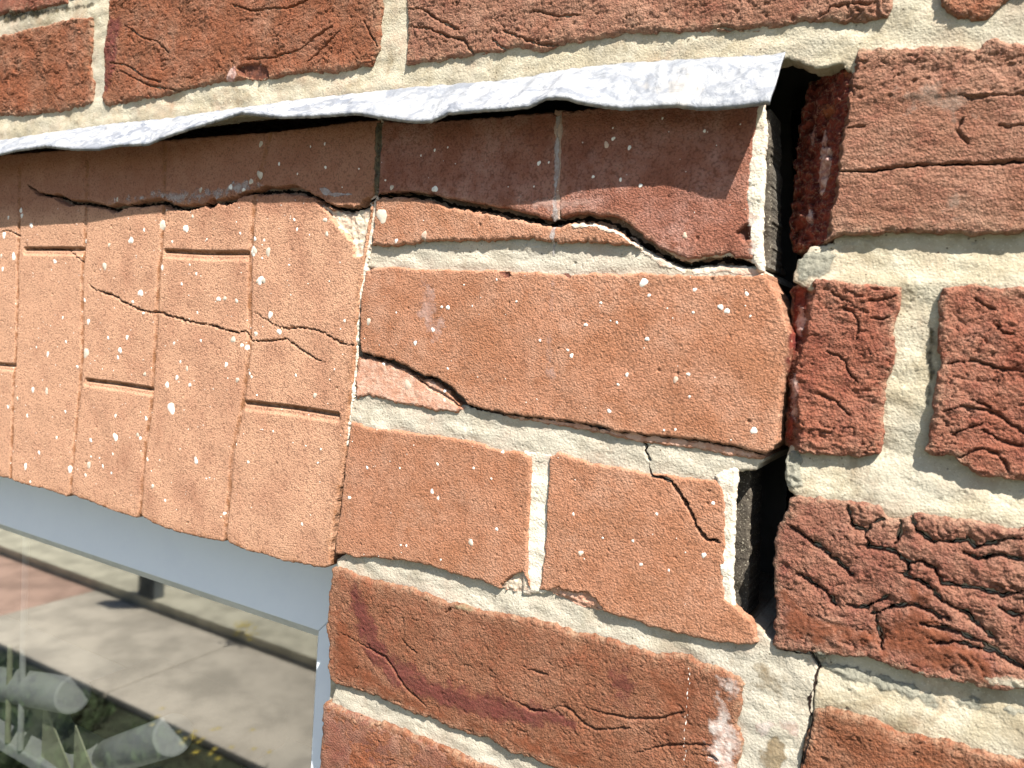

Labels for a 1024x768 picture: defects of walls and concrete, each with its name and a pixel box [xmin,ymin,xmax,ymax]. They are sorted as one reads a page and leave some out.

crack [791,108,801,188]
crack [30,187,755,268]
crack [10,231,763,541]
crack [784,485,848,569]
crack [800,505,1024,667]
crack [776,648,822,768]